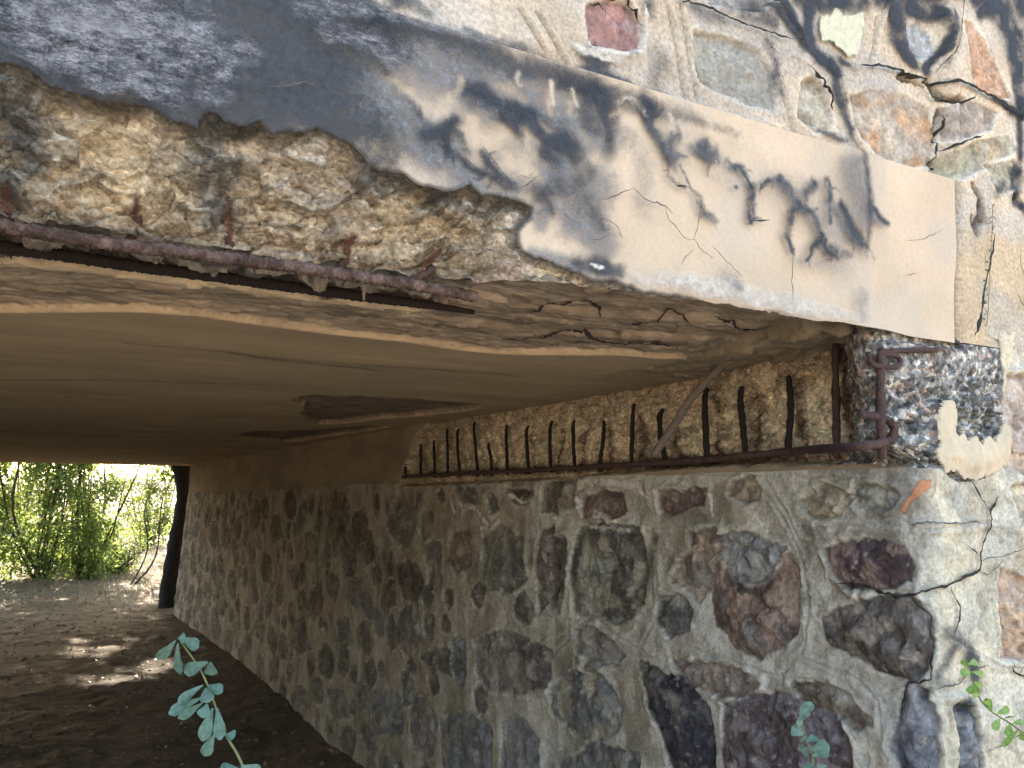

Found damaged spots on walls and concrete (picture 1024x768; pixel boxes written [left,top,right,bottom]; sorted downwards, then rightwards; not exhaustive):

crack [862,0,1024,173]
corrosion [224,196,234,238]
corrosion [343,234,357,258]
spalling [0,63,1012,487]
crack [537,179,739,274]
crack [506,300,689,347]
crack [715,316,766,331]
corrosion [515,348,857,474]
crack [836,479,1024,721]